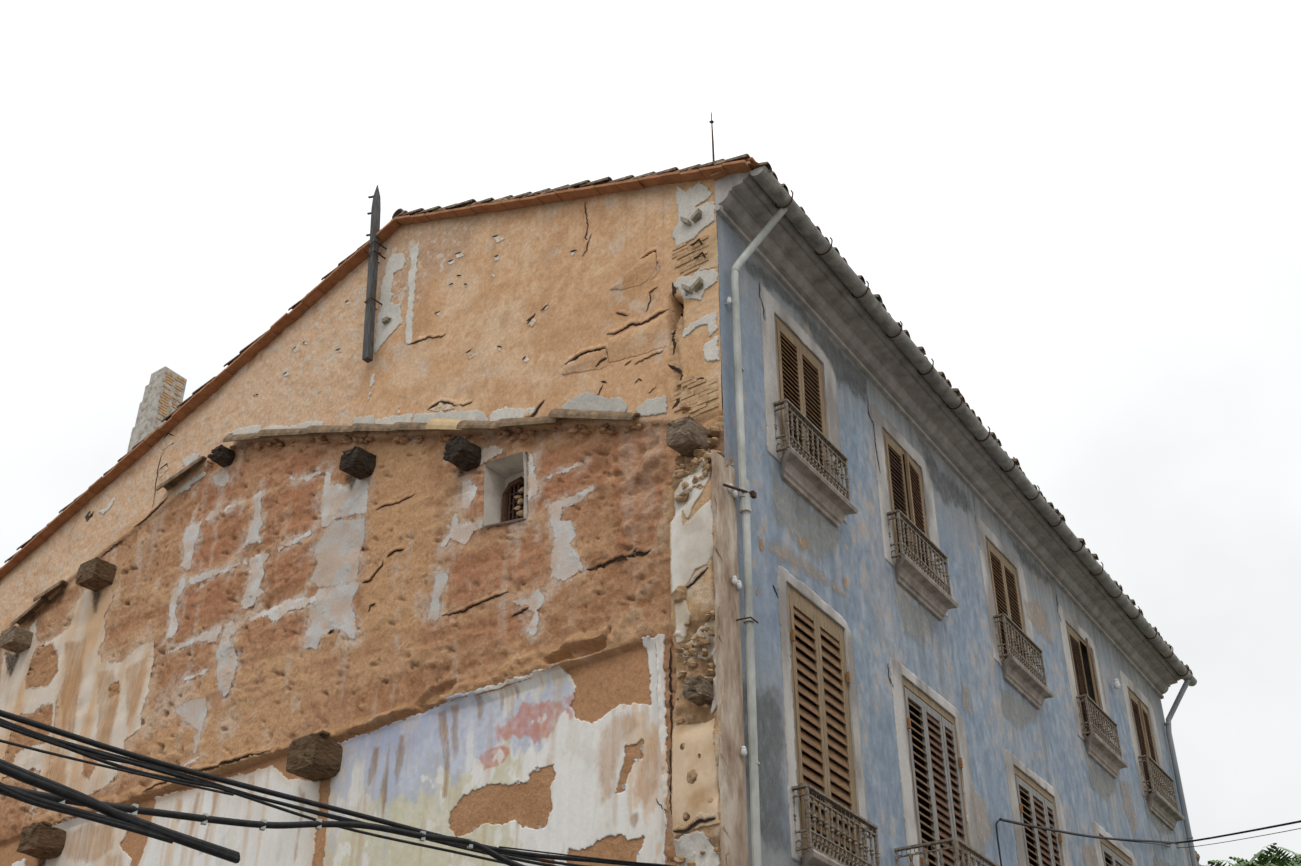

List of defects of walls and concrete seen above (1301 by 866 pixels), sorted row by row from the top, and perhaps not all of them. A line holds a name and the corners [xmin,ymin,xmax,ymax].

crack [581,201,592,256]
crack [564,246,713,409]
crack [376,492,415,510]
crack [362,545,405,612]
crack [442,589,529,617]
crack [586,544,654,570]
peeling [27,645,58,687]
peeling [3,705,52,764]
peeling [617,739,644,793]
peeling [448,766,556,837]
peeling [540,834,645,866]
spalling [673,812,721,866]